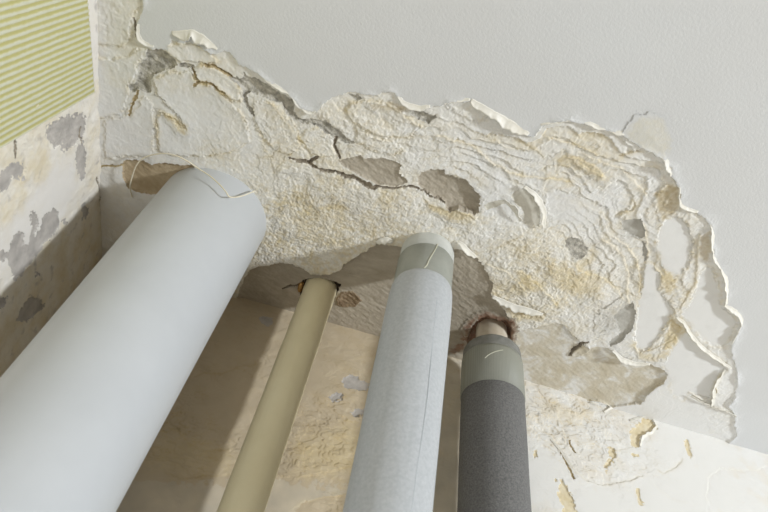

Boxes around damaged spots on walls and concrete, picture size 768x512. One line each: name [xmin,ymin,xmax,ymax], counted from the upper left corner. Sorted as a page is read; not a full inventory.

crack [191,63,233,95]
crack [128,90,140,116]
crack [288,136,445,203]
peeling [97,0,743,486]
rust [448,310,520,355]
peeling [554,478,577,512]